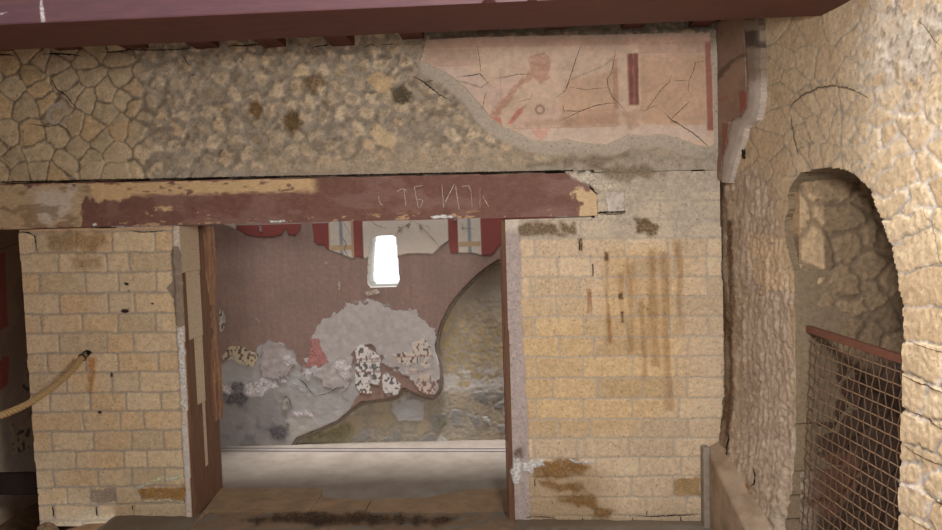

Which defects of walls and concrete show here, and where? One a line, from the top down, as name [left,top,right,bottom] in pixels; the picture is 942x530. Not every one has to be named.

crack [557,44,708,146]
crack [789,84,869,154]
spalling [259,298,440,395]
water stain [511,458,611,518]